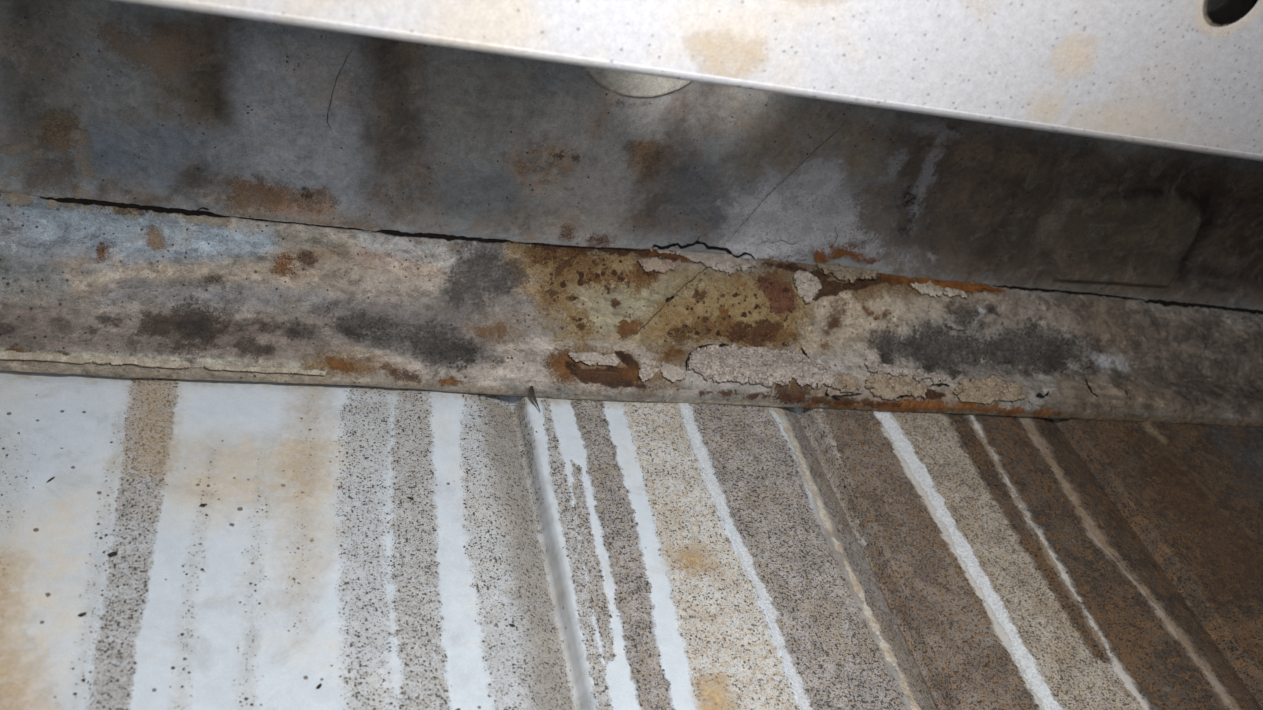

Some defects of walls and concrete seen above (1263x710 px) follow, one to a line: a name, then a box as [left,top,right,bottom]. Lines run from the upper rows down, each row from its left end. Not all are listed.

crack [40,117,848,337]
damp [715,123,947,276]
corrosion [272,251,318,276]
damp [132,295,232,361]
damp [235,339,275,362]
damp [336,311,502,370]
corrosion [506,226,1006,392]
peeling [639,342,1028,404]
corrosion [699,378,1061,418]
crack [993,285,1263,314]